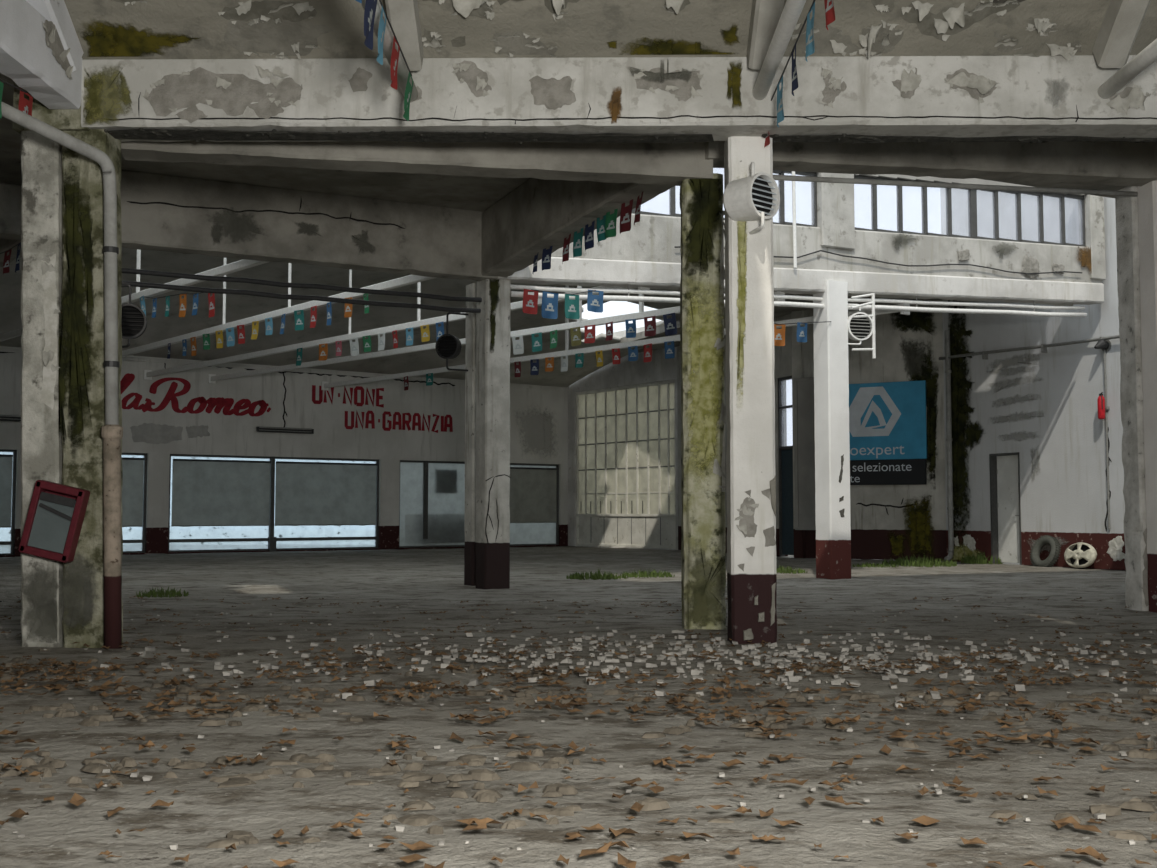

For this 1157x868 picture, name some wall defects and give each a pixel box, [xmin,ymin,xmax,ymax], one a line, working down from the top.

leakage [83,30,120,57]
spalling [104,0,714,144]
peeling [819,68,847,108]
peeling [892,68,921,99]
peeling [791,0,1025,60]
peeling [944,68,999,104]
peeling [994,18,1081,60]
leakage [685,179,722,276]
leakage [59,185,94,441]
leakage [690,297,724,459]
peeling [734,475,776,571]
spalling [743,583,776,641]